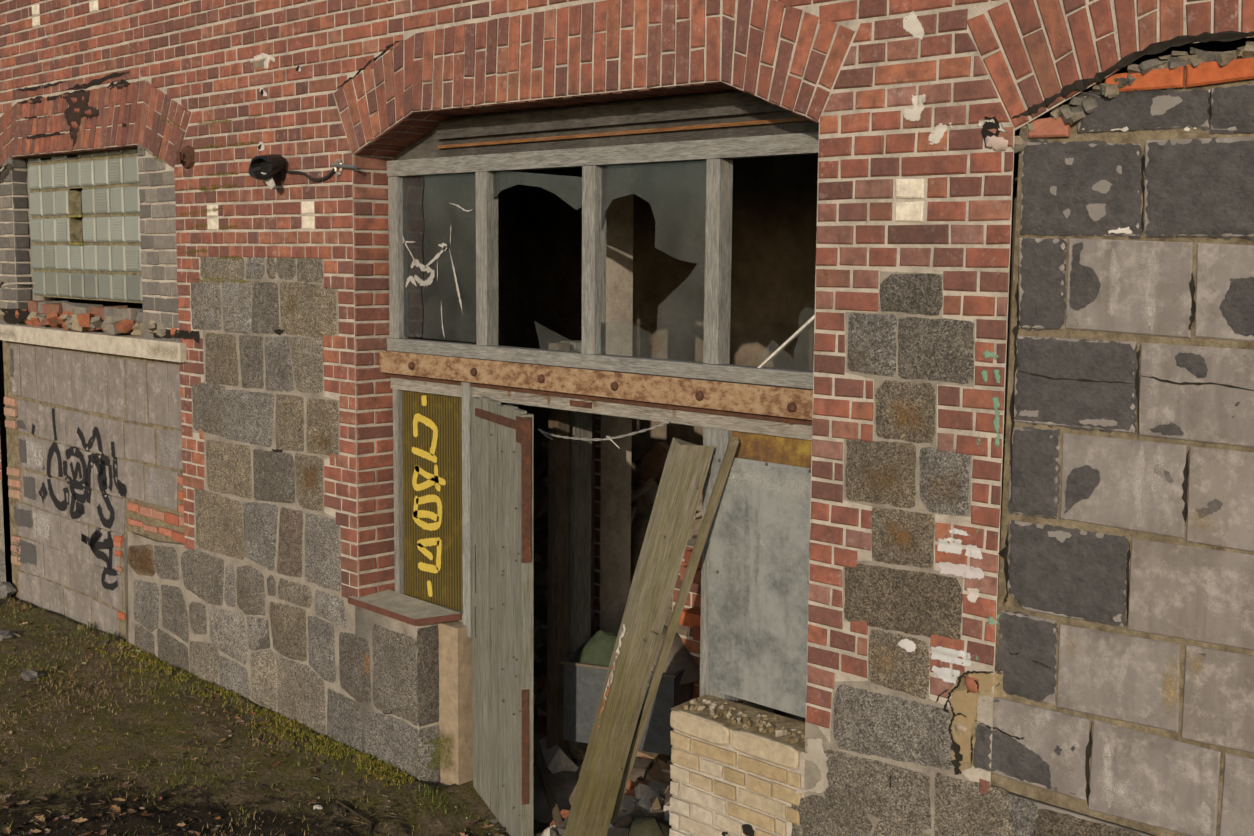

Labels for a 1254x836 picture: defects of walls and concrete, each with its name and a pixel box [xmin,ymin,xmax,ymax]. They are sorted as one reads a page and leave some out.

spalling [63,91,99,147]
spalling [0,300,199,343]
spalling [950,85,1254,790]